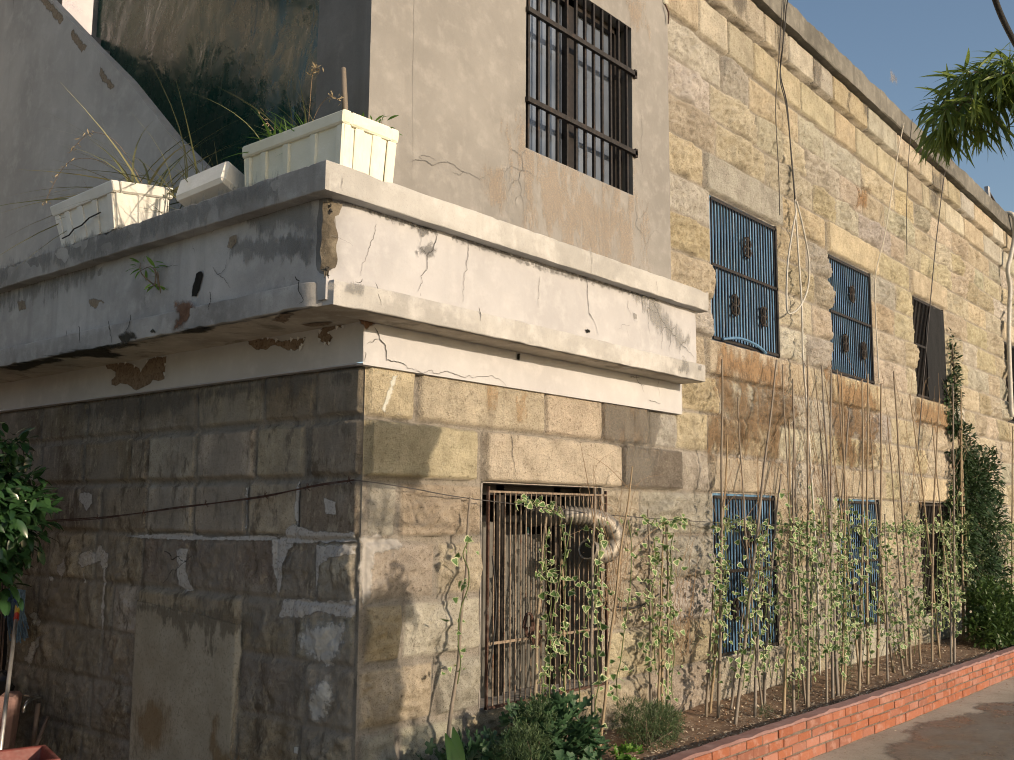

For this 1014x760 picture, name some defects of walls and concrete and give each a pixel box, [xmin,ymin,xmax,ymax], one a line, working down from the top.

crack [412,149,538,218]
spalling [320,202,343,278]
water stain [452,236,655,302]
peeling [106,355,166,390]
peeling [248,337,305,351]
peeling [302,322,344,346]
crack [365,328,519,393]
peeling [298,620,348,667]
peeling [309,681,333,721]